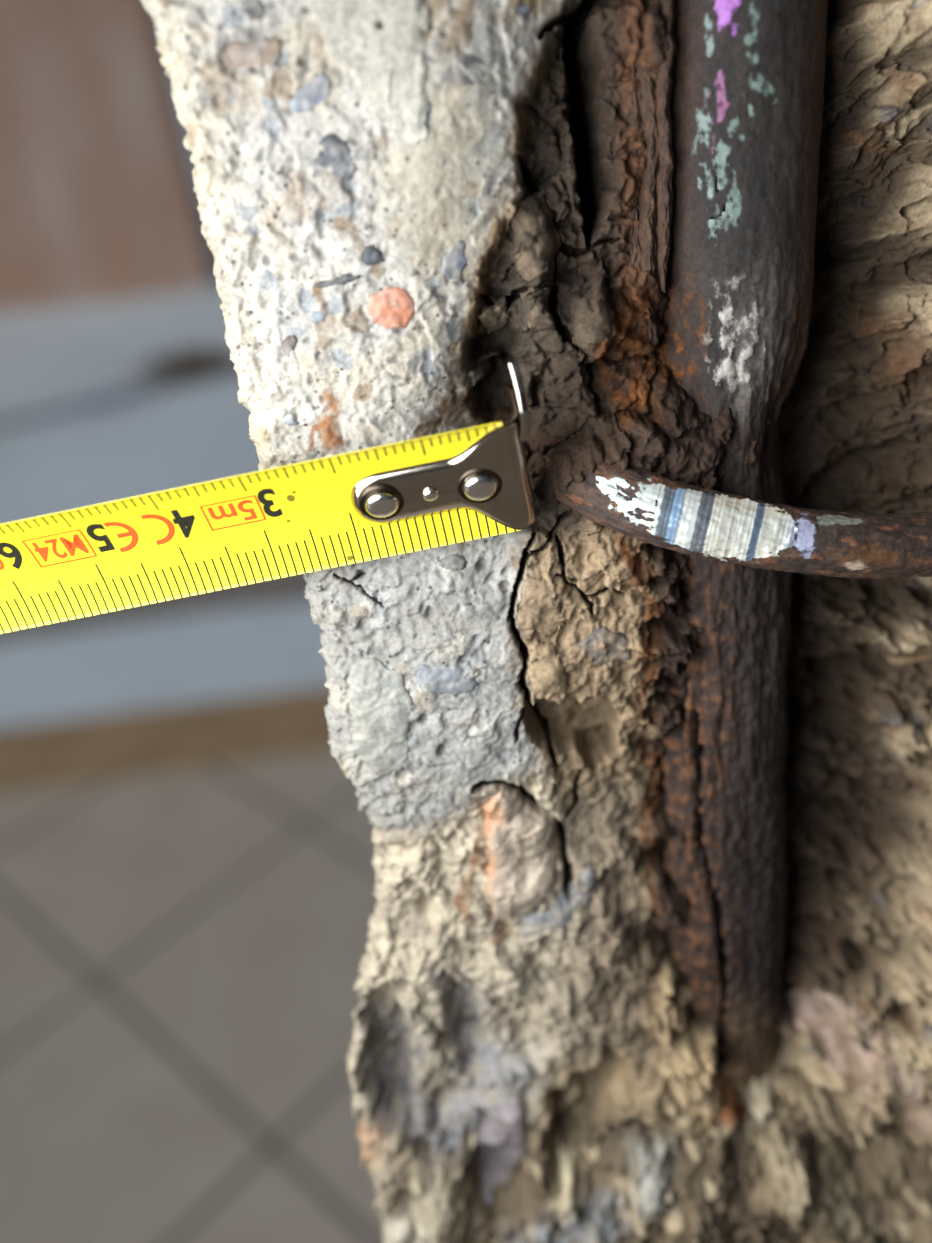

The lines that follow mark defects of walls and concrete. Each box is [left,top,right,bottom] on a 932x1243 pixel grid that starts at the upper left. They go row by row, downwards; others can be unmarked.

rust [597,311,692,422]
crack [472,510,624,891]
rust [618,534,654,586]
spalling [346,0,932,1243]